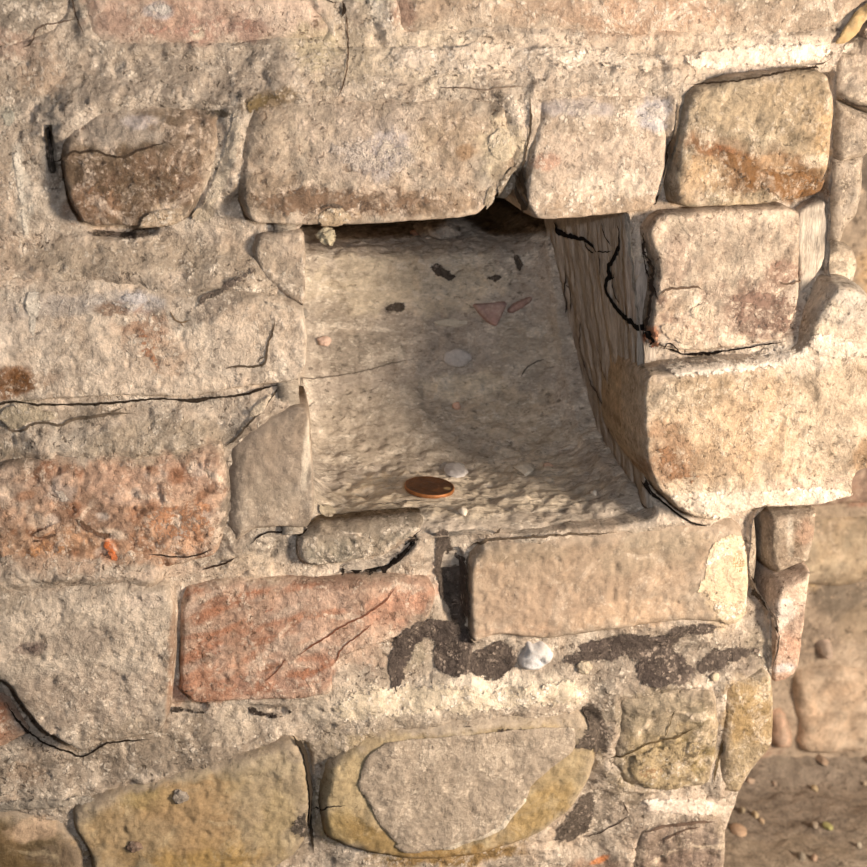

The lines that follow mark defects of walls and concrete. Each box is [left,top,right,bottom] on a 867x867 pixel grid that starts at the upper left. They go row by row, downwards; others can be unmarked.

crack [328,0,353,96]
crack [0,321,277,449]
crack [563,273,607,404]
crack [554,223,785,356]
crack [265,530,421,681]
water stain [334,529,610,756]
water stain [563,534,779,689]
crack [292,735,345,852]